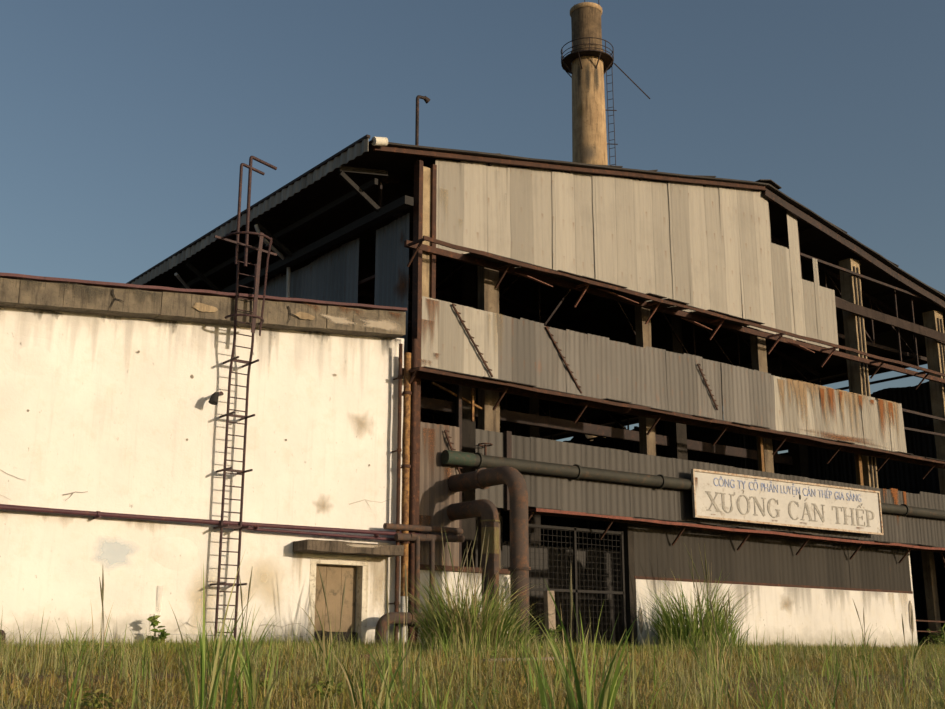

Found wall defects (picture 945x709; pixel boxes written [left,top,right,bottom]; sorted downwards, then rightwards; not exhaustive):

spalling [192,303,218,312]
spalling [294,312,400,331]
corrosion [778,378,898,428]